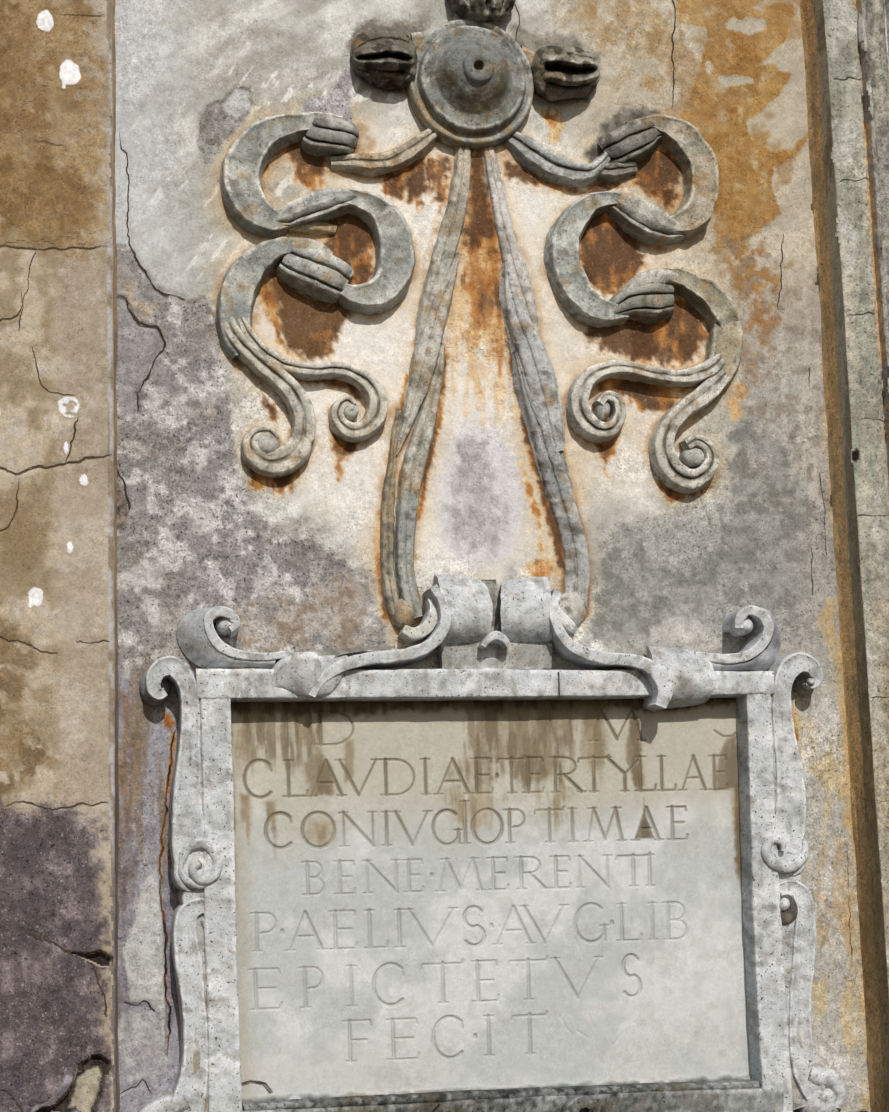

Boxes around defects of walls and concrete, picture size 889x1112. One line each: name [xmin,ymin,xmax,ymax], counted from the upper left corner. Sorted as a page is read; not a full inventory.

water stain [0,0,112,269]
crack [0,133,184,531]
peeling [196,84,255,166]
rust [254,268,359,364]
rust [416,150,565,582]
rust [579,213,651,300]
rust [674,0,809,252]
crack [0,636,110,653]
crack [6,801,108,810]
water stain [0,599,114,1112]
crack [27,730,176,1057]
peeling [37,864,172,1112]